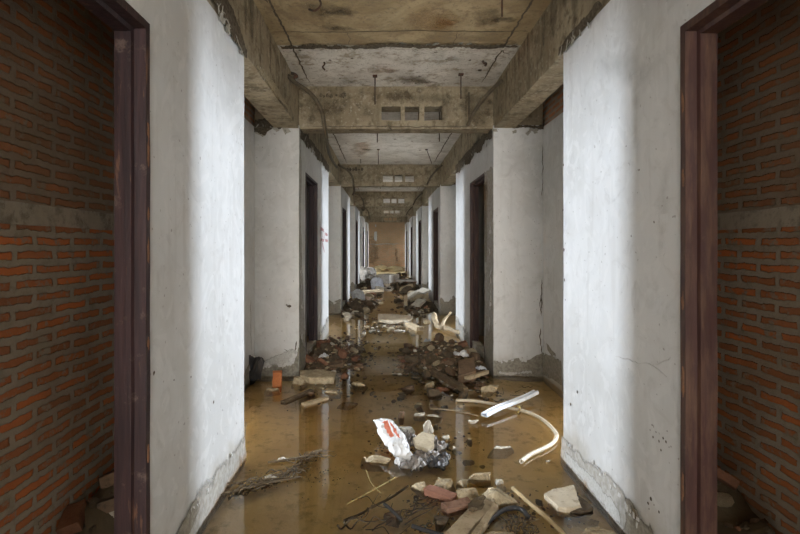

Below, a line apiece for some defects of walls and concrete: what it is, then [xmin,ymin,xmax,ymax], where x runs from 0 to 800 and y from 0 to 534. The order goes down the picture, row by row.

spalling [214,0,247,58]
crack [265,0,533,82]
spalling [558,1,602,56]
peeling [253,118,329,379]
peeling [484,167,562,385]
crack [537,284,545,352]
peeling [177,437,246,534]
peeling [561,437,639,534]